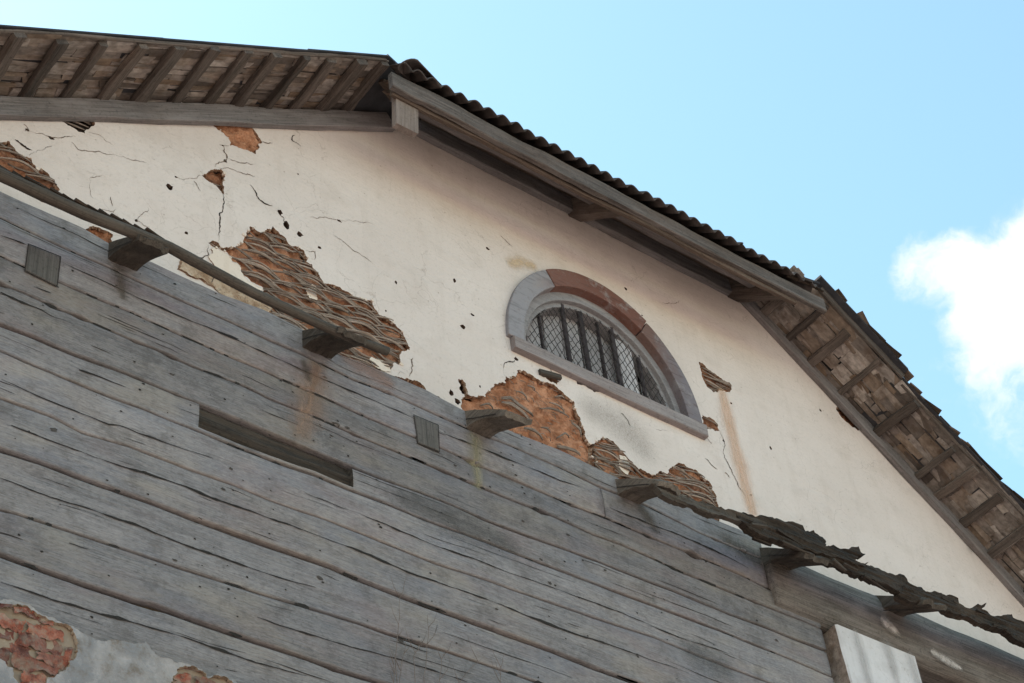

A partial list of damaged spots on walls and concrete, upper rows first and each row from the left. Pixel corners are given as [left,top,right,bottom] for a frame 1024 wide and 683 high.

spalling [0,141,60,191]
crack [15,124,146,212]
spalling [202,169,226,194]
spalling [214,125,262,154]
spalling [86,226,113,243]
crack [177,145,285,305]
spalling [177,226,426,390]
spalling [699,362,732,392]
crack [0,211,766,683]
spalling [458,368,720,521]
spalling [0,603,78,683]
spalling [171,666,233,683]